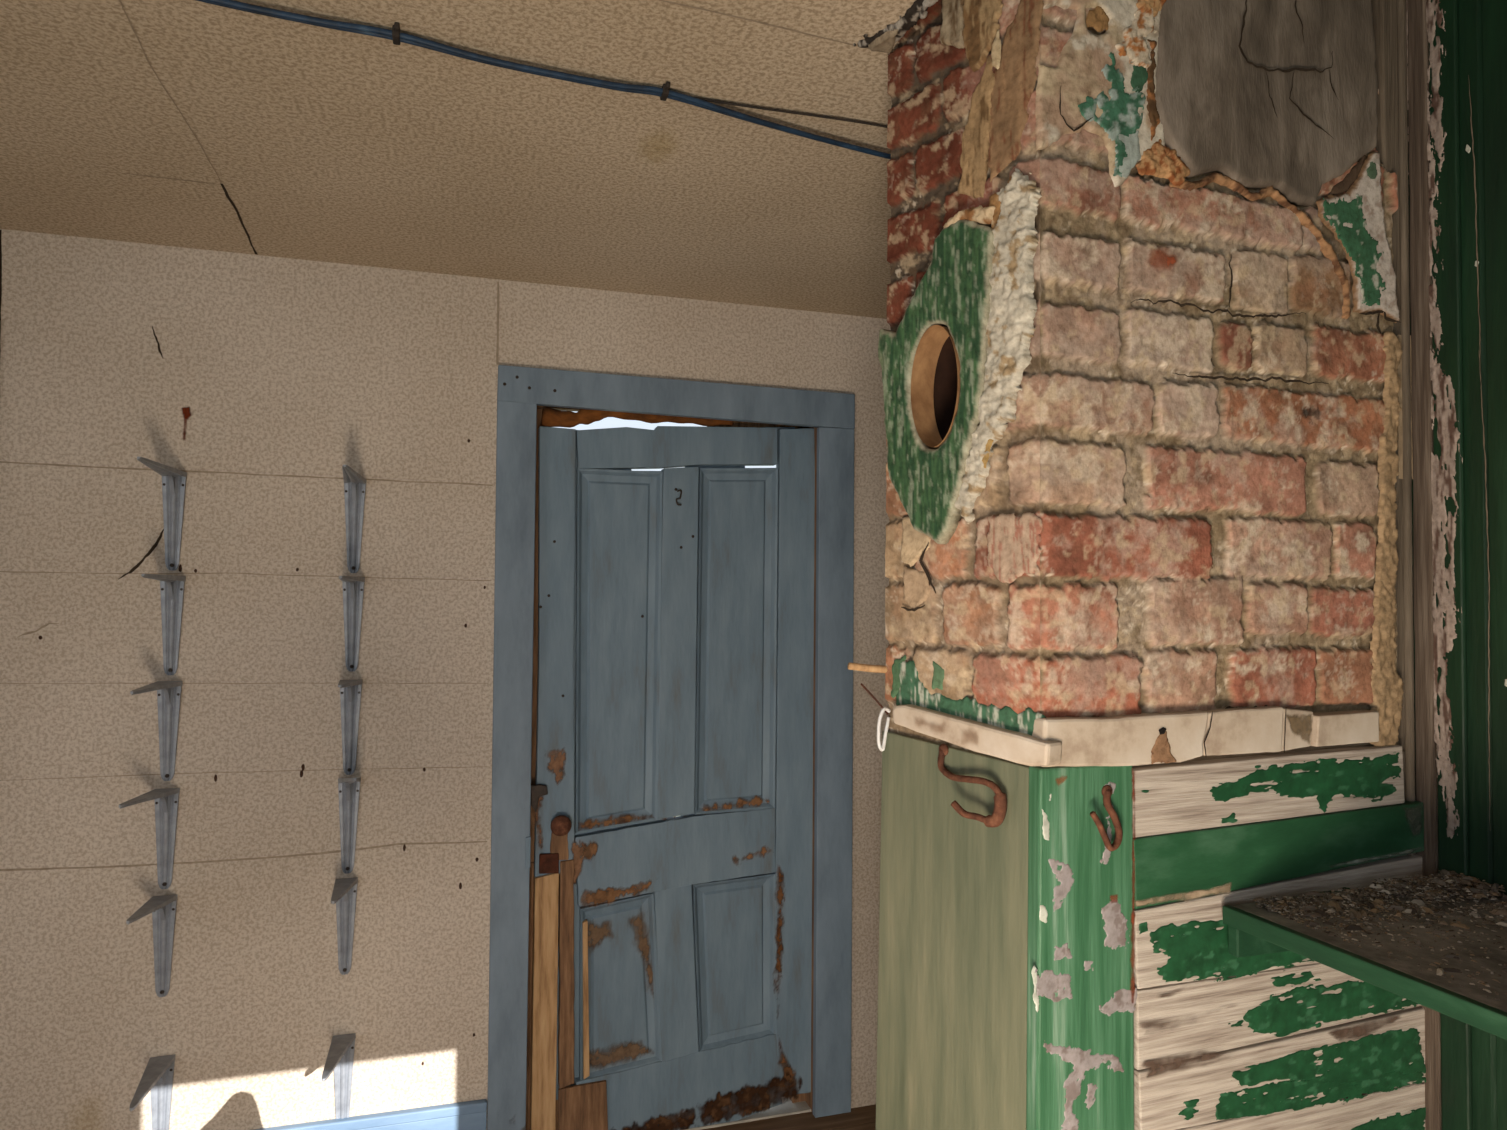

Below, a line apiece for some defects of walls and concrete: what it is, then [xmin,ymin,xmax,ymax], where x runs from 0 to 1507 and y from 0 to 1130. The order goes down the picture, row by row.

crack [115,0,257,254]
crack [0,230,8,350]
flaking render [940,0,1399,583]
crack [1131,254,1306,318]
crack [1174,373,1329,385]
peeling [1426,0,1463,839]
crack [0,529,491,581]
peeling [1210,752,1402,823]
crack [0,841,487,871]
peeling [1099,884,1426,1120]
peeling [1043,1040,1124,1130]
peeling [1351,1108,1426,1130]